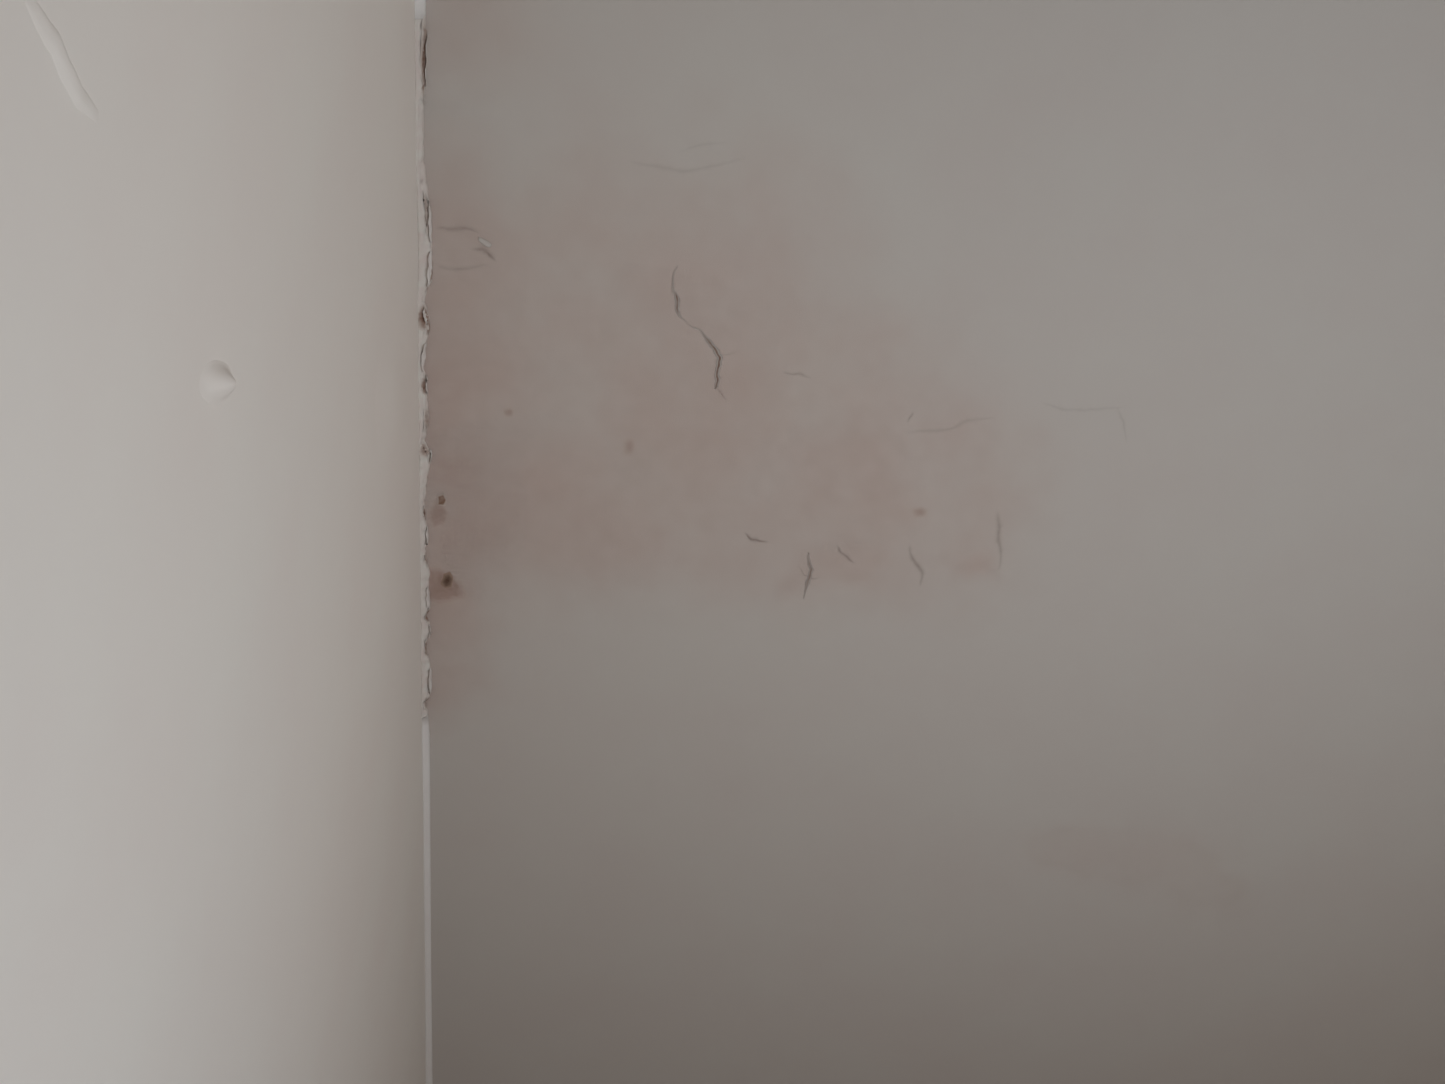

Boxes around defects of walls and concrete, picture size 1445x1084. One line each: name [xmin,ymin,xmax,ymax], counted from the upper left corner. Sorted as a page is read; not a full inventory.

crack [672,268,722,388]
crack [804,553,813,596]